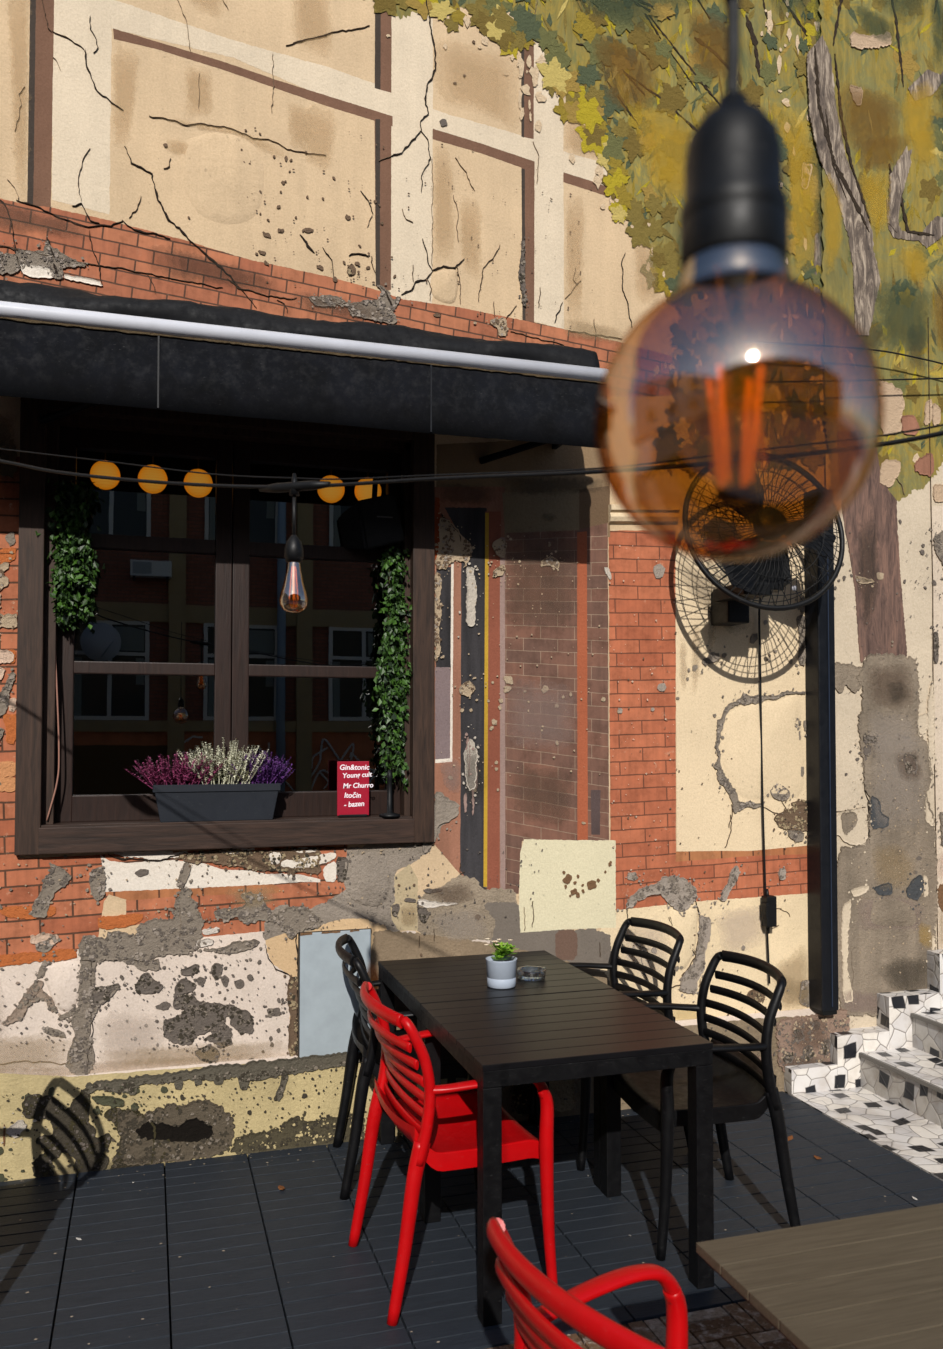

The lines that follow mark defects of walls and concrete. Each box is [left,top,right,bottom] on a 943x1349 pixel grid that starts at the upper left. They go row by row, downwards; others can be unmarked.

crack [42,0,370,156]
crack [0,146,297,311]
spalling [308,244,400,325]
crack [300,0,632,345]
peeling [879,453,943,502]
peeling [882,381,941,435]
peeling [434,518,477,662]
spalling [0,650,16,739]
spalling [626,865,739,995]
crack [724,802,787,848]
spalling [775,653,943,1072]
spalling [1,847,365,1178]